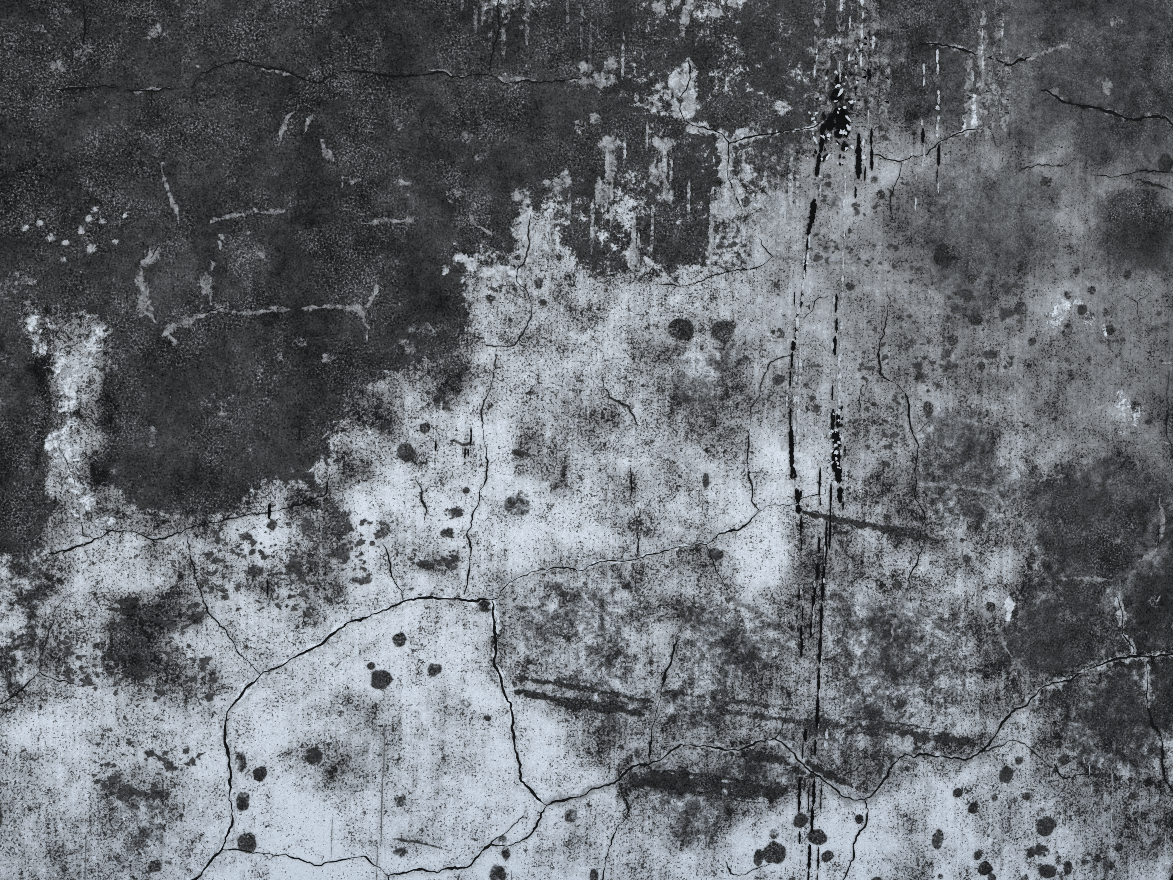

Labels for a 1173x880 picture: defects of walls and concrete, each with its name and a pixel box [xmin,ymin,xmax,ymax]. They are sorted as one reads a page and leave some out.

peeling [579,56,618,88]
crack [920,42,1072,67]
crack [1041,89,1173,126]
peeling [595,136,619,209]
peeling [625,72,795,267]
peeling [442,189,552,300]
peeling [809,199,923,284]
leakage [0,0,1173,698]
crack [49,215,1173,880]
leakage [626,174,980,880]
crack [0,592,82,704]
leakage [519,582,658,733]